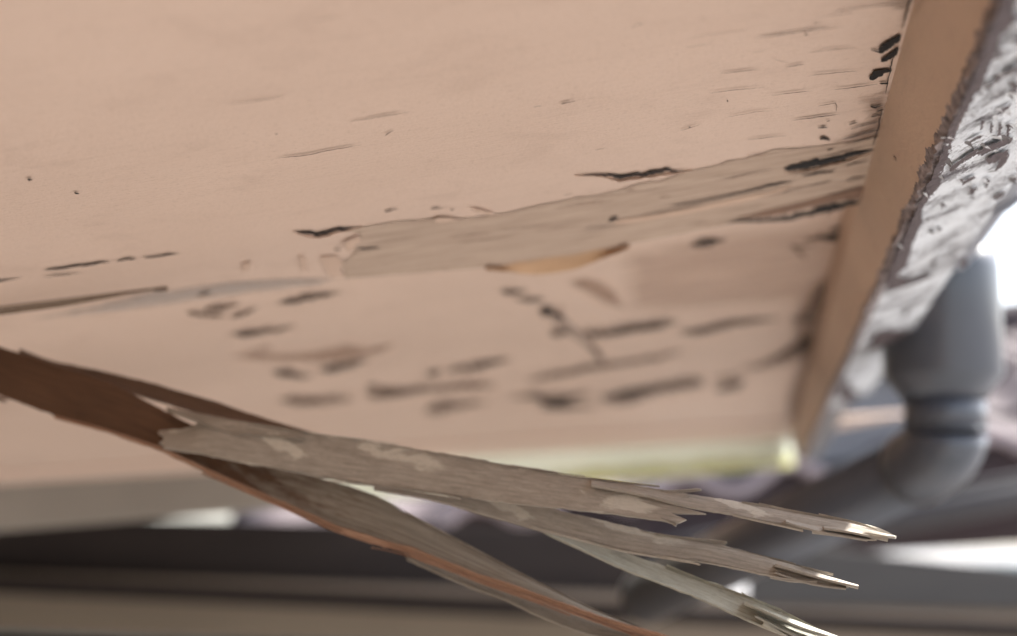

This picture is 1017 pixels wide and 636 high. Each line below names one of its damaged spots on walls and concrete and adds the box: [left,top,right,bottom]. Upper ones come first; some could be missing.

peeling [341,137,877,278]
peeling [883,0,1017,292]
crack [273,289,818,414]
peeling [867,329,916,352]